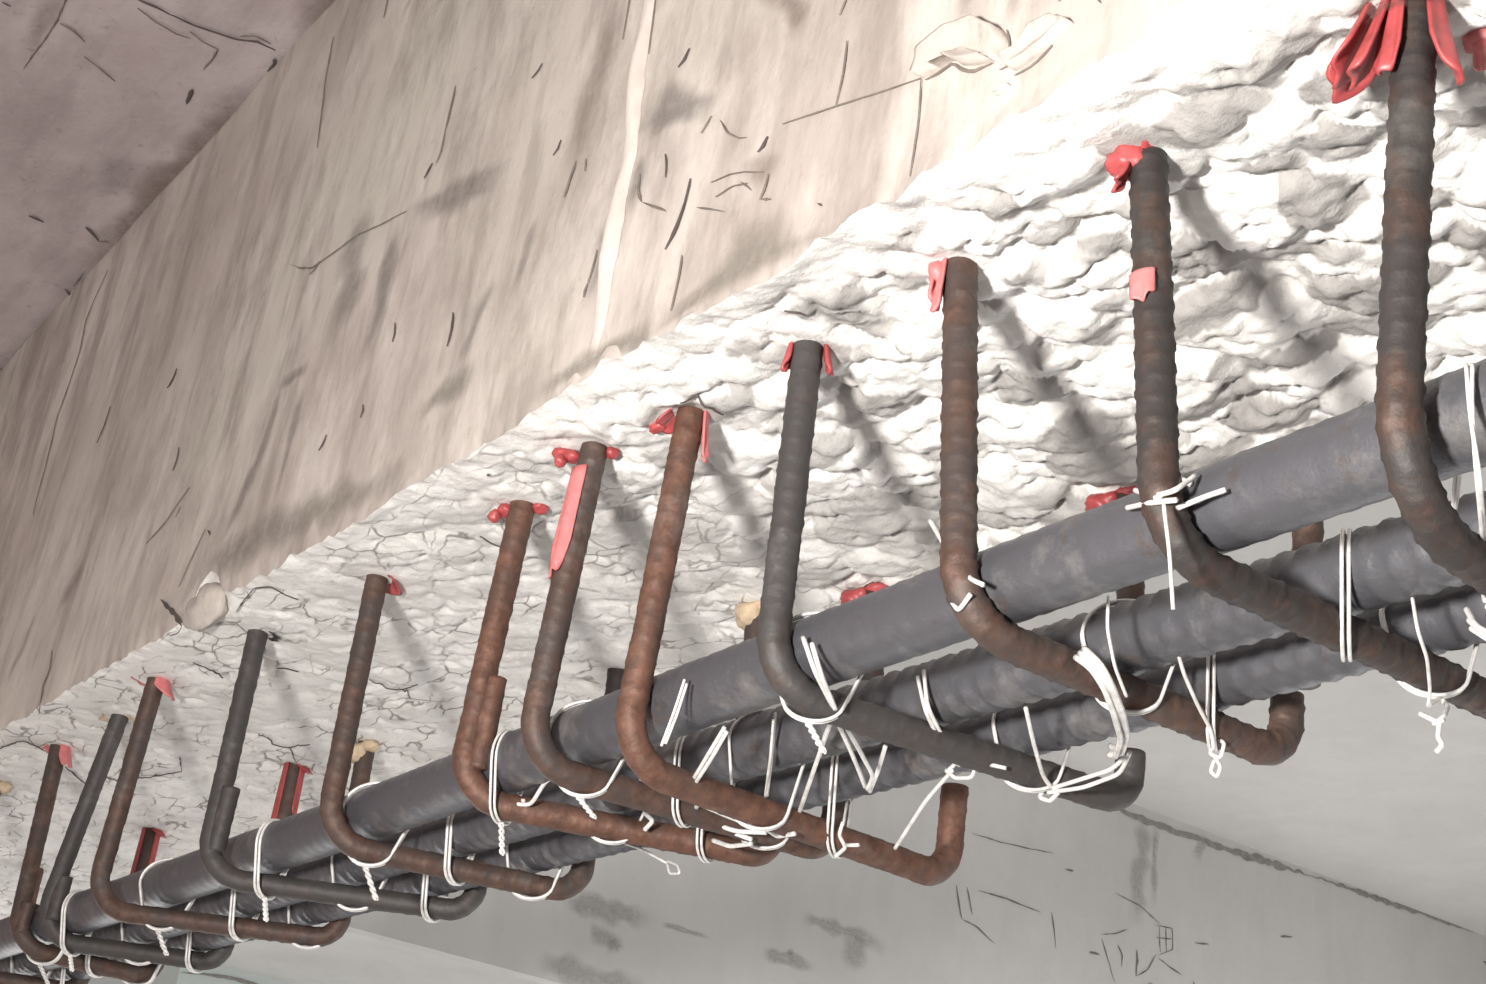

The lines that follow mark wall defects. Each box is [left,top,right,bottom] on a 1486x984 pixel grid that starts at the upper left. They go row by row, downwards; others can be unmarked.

crack [24,0,115,82]
crack [137,0,277,72]
crack [782,0,1052,176]
crack [637,116,770,311]
spalling [791,0,1486,853]
crack [0,652,182,784]
crack [146,487,223,678]
crack [236,586,298,612]
crack [259,735,310,762]
crack [369,679,418,699]
spalling [0,340,853,984]
spalling [840,782,969,886]